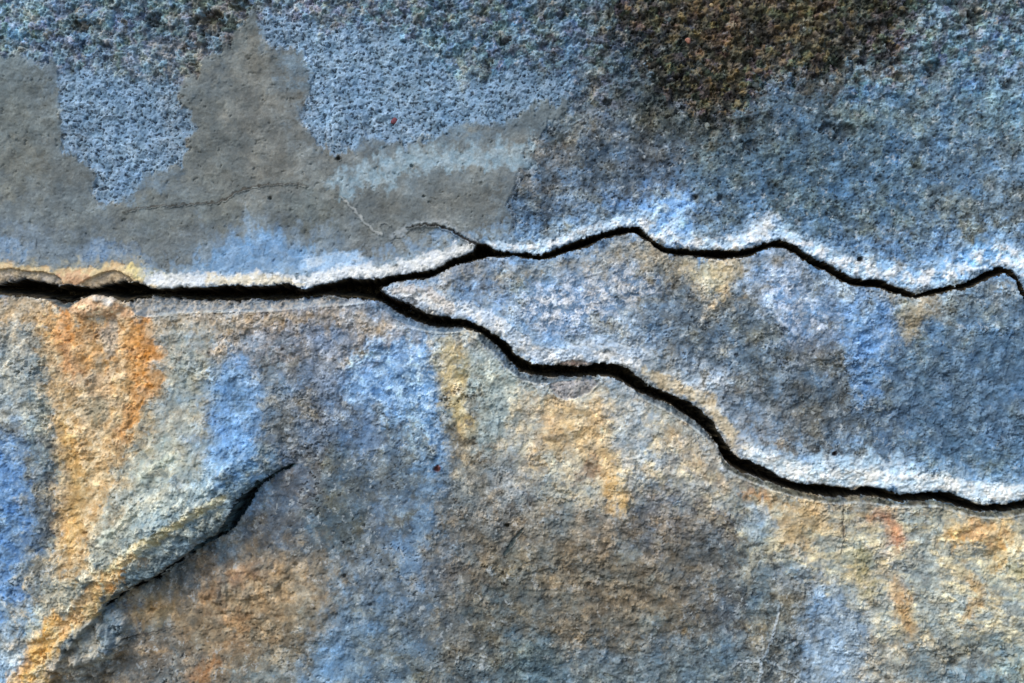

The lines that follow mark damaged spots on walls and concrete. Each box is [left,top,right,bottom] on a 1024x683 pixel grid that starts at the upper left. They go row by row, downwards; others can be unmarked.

crack [0,175,1024,557]